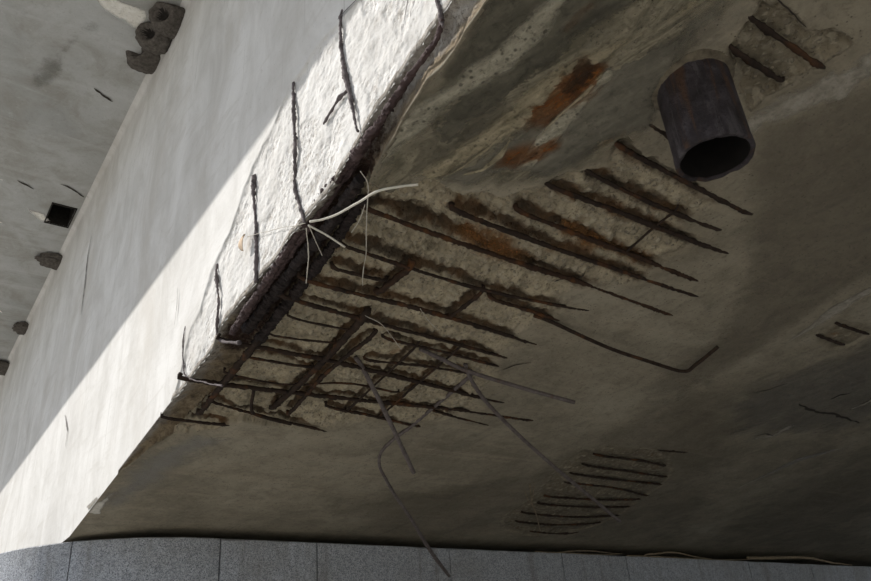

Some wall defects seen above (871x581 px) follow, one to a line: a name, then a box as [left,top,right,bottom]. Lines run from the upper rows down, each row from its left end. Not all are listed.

water stain [380,0,722,184]
rust [530,59,604,125]
spalling [716,0,866,122]
rust [502,139,558,166]
spalling [116,0,743,479]
spalling [808,314,871,354]
crack [799,393,859,423]
spalling [498,443,681,537]